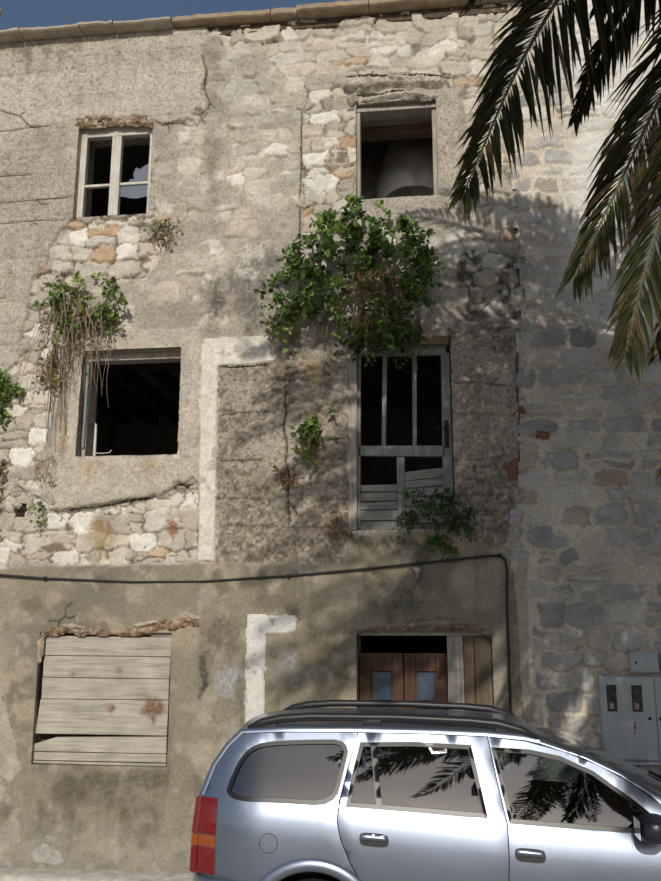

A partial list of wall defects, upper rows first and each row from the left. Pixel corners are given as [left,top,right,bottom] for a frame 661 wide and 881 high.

crack [154,58,215,132]
spalling [0,216,199,567]
crack [226,383,297,530]
crack [455,353,520,462]
spalling [37,614,203,663]